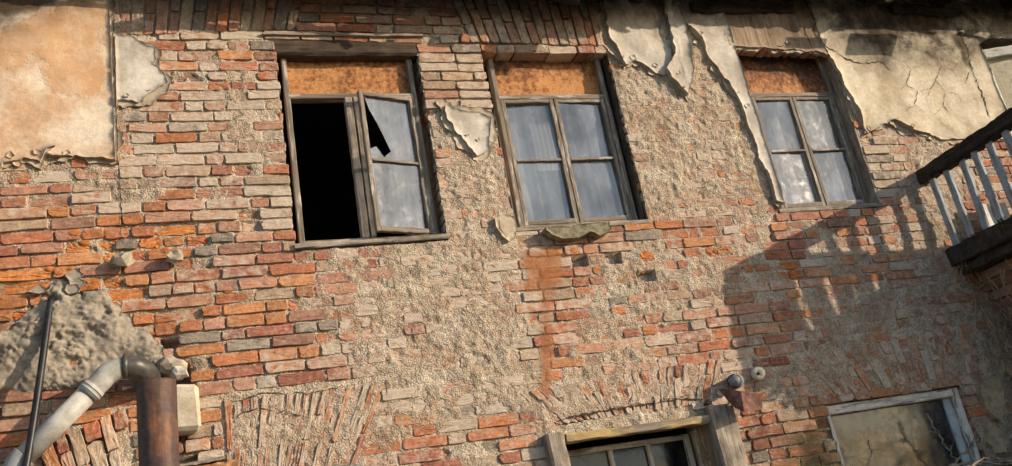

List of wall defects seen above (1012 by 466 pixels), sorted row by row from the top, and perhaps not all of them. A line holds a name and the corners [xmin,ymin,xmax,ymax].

peeling [0,0,174,171]
peeling [435,99,499,163]
peeling [598,0,1007,210]
crack [804,10,990,117]
peeling [28,284,48,295]
peeling [46,266,85,295]